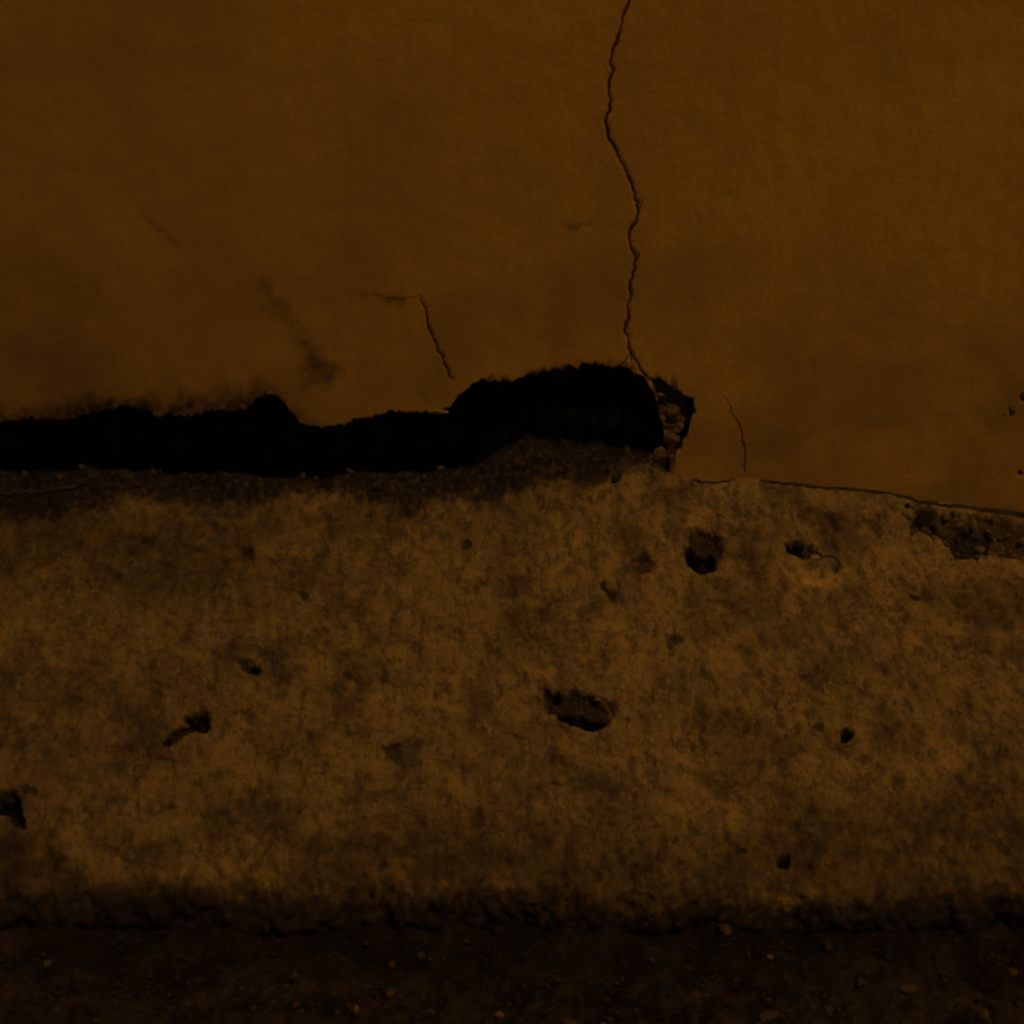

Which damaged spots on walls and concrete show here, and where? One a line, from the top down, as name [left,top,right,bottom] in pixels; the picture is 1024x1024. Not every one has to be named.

crack [604,0,654,382]
crack [367,294,453,380]
spalling [0,363,695,494]
spalling [683,529,724,576]
spalling [786,542,822,560]
spalling [900,503,1024,561]
spalling [163,711,211,746]
spalling [543,688,611,732]